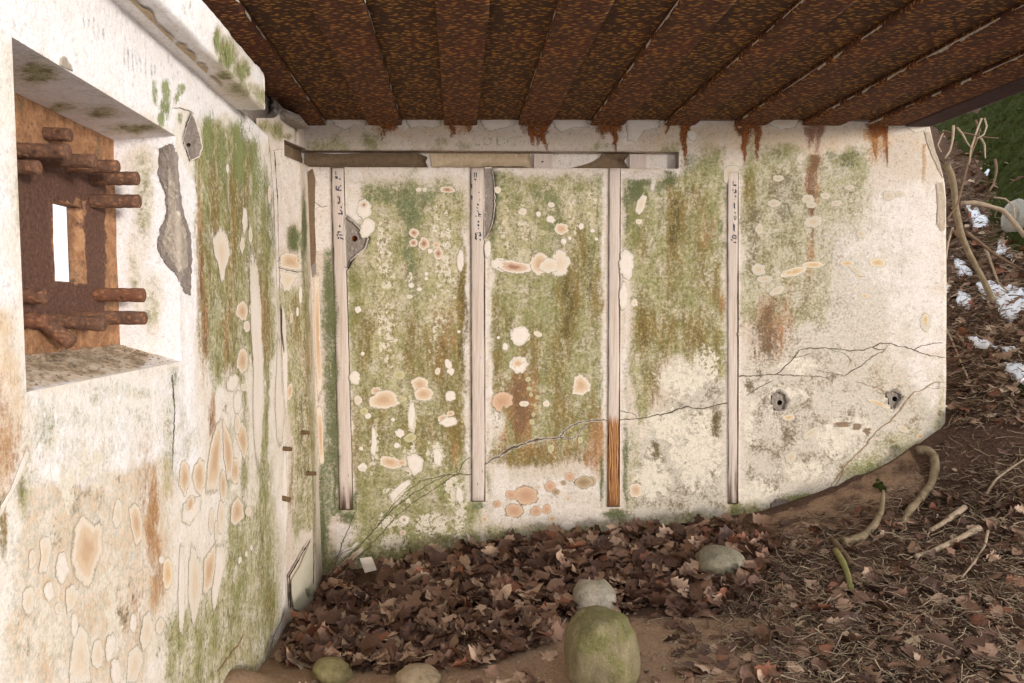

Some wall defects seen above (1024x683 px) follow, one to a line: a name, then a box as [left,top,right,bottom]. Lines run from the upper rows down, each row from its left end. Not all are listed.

spalling [157,113,203,295]
spalling [343,199,375,270]
peeling [483,167,598,277]
damp [624,171,677,231]
rust [734,125,762,161]
rust [804,126,824,215]
rust [867,124,888,163]
peeling [159,169,324,635]
damp [703,413,721,438]
crack [270,342,946,648]
damp [600,445,628,516]
crack [217,634,245,672]